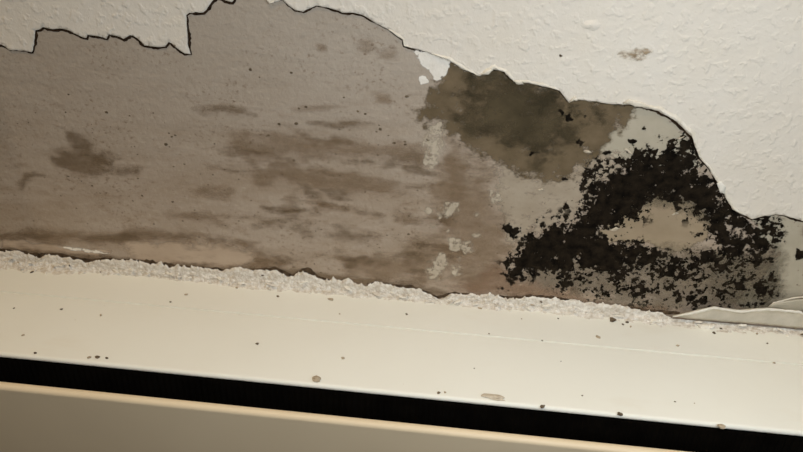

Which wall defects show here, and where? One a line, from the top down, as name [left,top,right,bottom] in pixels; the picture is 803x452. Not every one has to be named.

peeling [0,0,803,335]
damp [416,62,785,311]